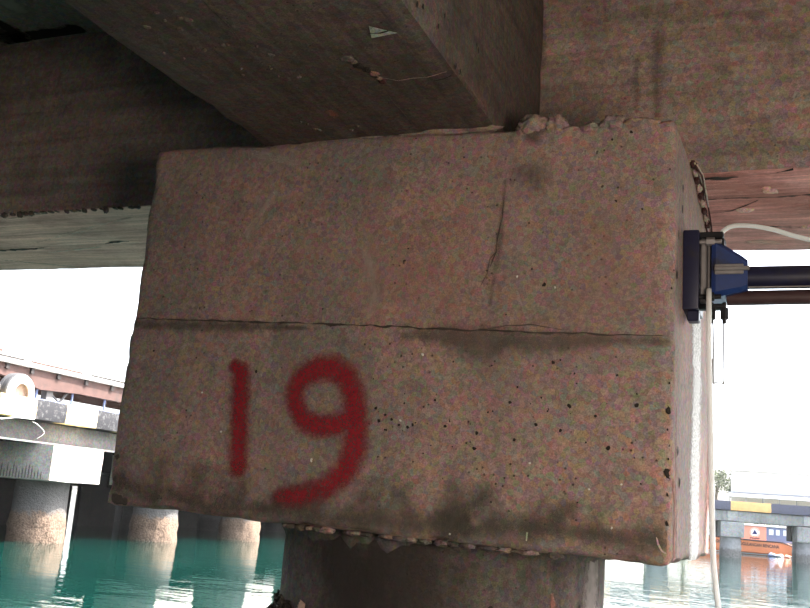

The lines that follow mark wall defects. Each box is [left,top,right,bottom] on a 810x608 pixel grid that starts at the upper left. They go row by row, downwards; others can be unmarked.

crack [0,20,86,44]
crack [481,202,504,285]
crack [135,318,670,337]